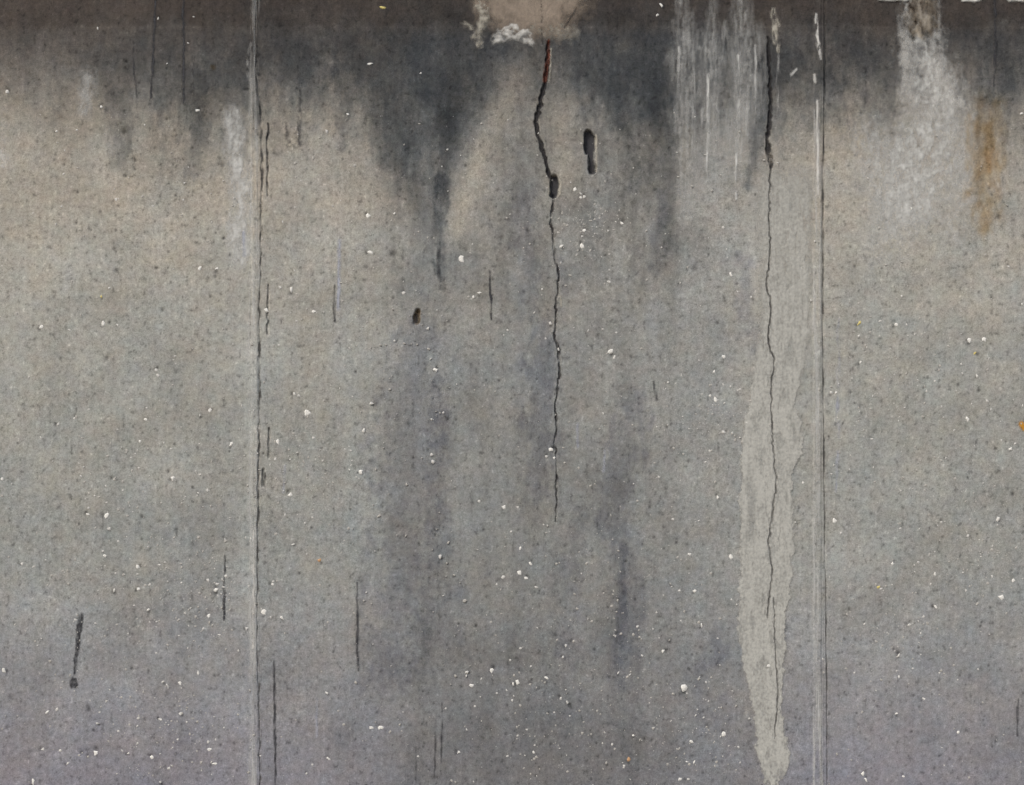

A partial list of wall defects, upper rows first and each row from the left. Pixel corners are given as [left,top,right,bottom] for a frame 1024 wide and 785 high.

peeling [474,0,582,44]
crack [534,40,551,178]
spalling [584,131,597,174]
crack [765,41,774,382]
leakage [868,0,967,236]
crack [553,265,562,505]